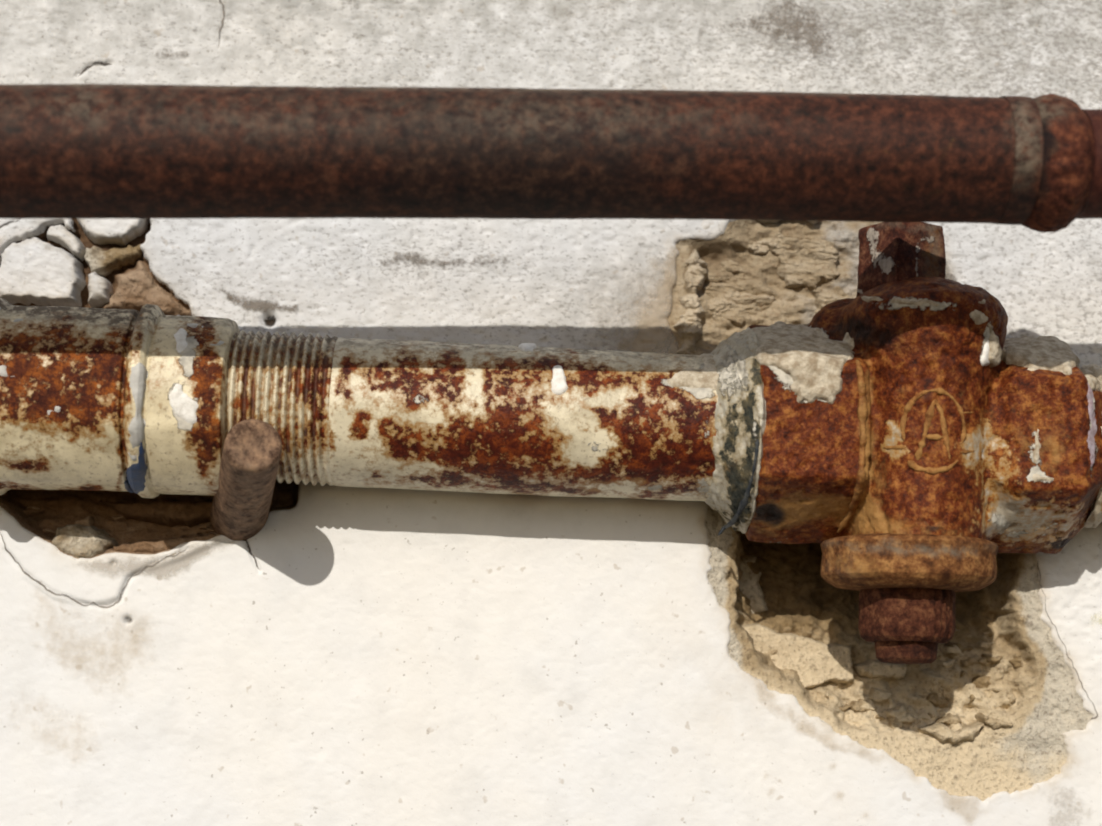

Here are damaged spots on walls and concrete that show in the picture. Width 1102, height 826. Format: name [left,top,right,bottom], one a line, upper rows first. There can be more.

crack [0,218,192,316]
flaking render [666,219,881,355]
crack [0,533,187,608]
flaking render [0,489,219,575]
flaking render [269,479,299,512]
flaking render [705,439,1098,801]